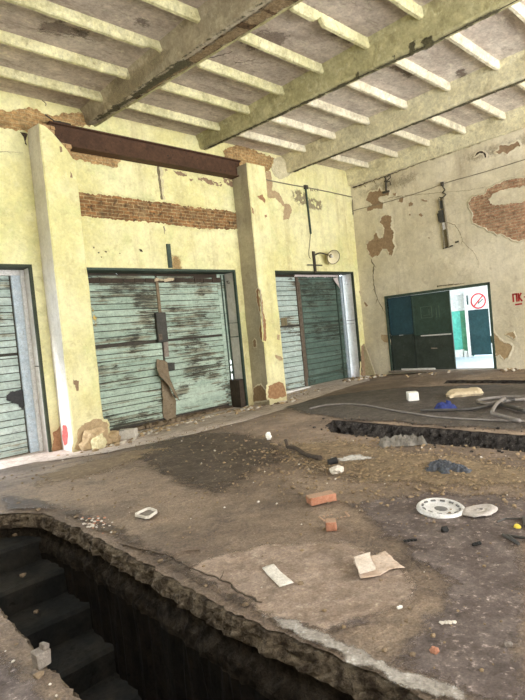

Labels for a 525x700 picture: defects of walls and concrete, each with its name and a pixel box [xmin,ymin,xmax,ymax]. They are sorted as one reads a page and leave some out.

flaking render [0,106,92,148]
flaking render [78,190,238,232]
flaking render [467,176,525,243]
crack [371,259,385,313]
spalling [253,287,267,348]
spalling [253,380,287,403]
spalling [71,417,110,452]
crack [120,543,262,603]